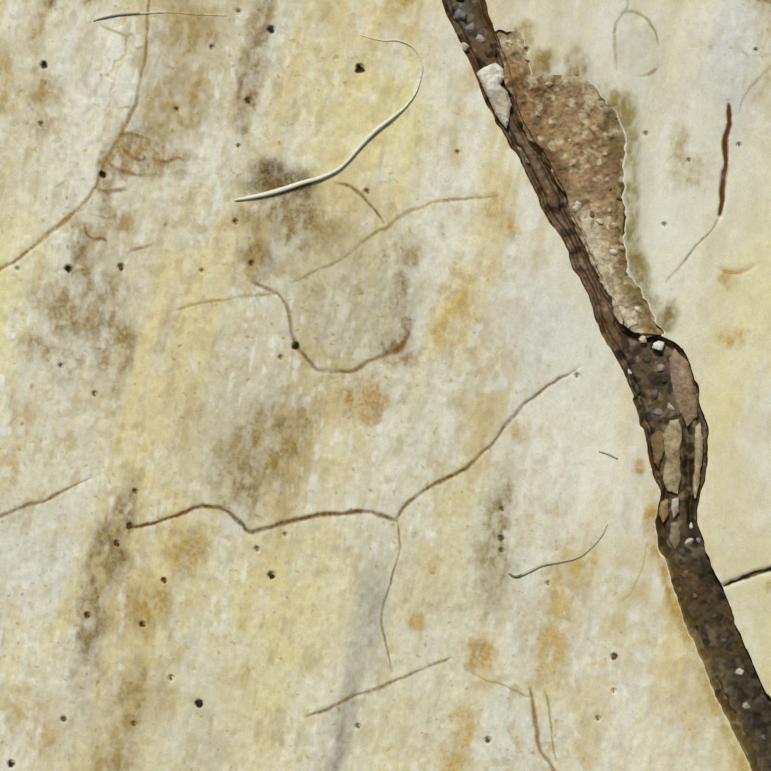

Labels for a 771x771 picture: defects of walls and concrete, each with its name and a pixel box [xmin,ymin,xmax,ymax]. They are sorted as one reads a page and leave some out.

crack [143,0,151,61]
spalling [495,30,664,337]
crack [48,201,86,233]
crack [0,246,33,269]
crack [442,0,771,771]
crack [6,484,77,514]
crack [133,426,505,534]